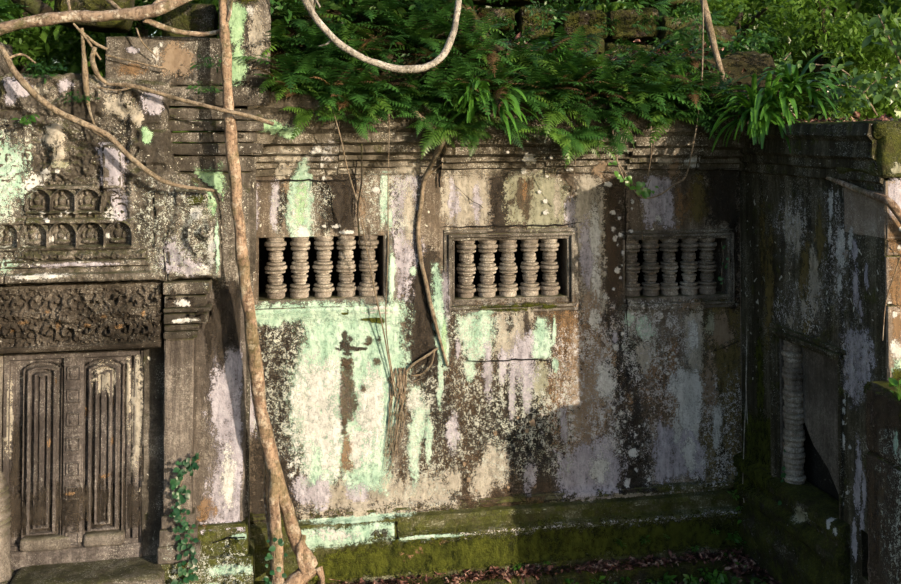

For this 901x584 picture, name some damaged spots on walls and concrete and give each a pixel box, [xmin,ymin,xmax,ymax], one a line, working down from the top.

leakage [250,393,270,525]
leakage [257,162,742,542]
crack [468,358,552,372]
leakage [754,187,858,422]
leakage [842,323,901,584]
leakage [891,186,901,209]